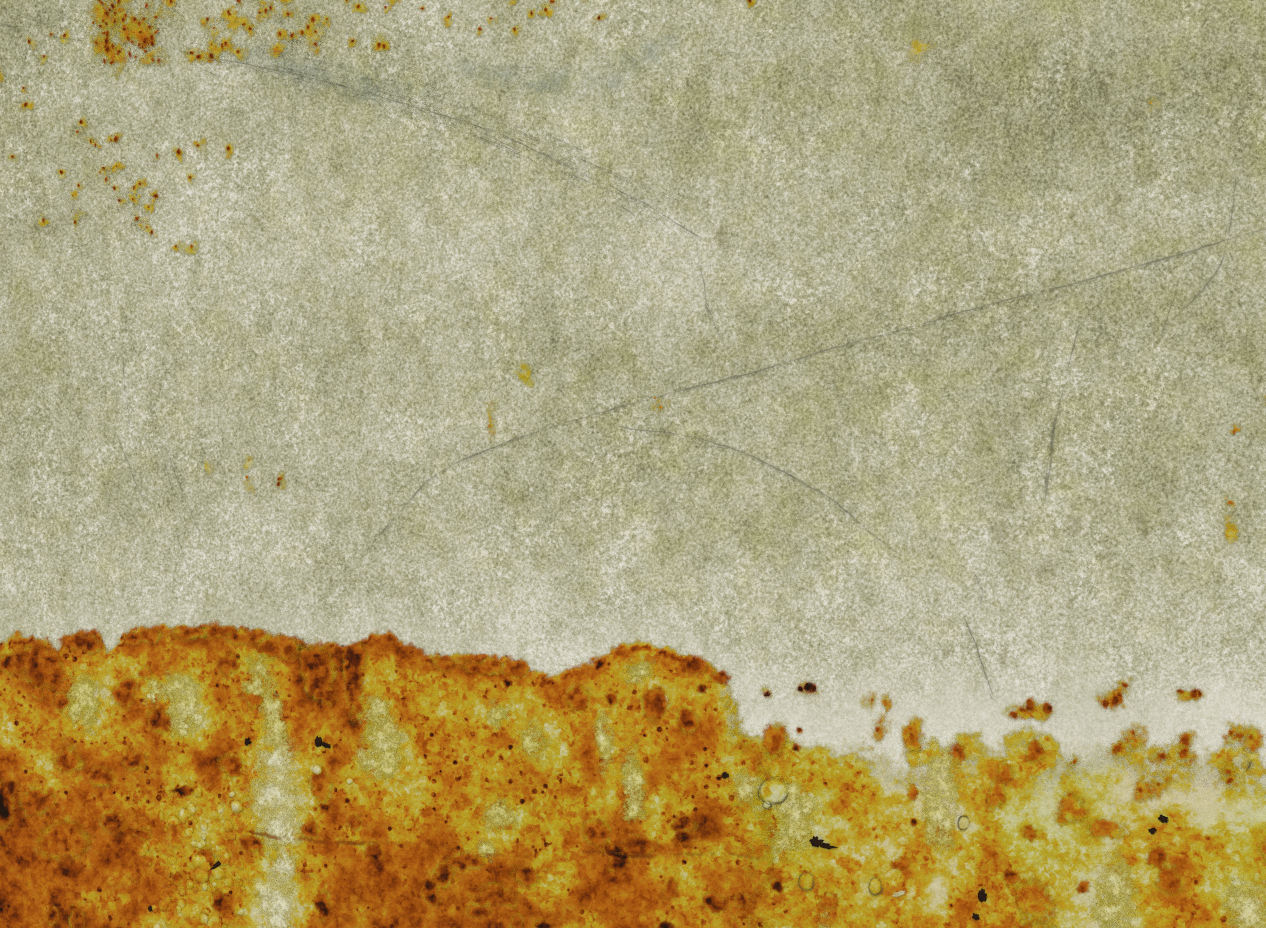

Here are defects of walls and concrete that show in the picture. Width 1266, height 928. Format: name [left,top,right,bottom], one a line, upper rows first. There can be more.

rust [90,0,176,77]
rust [183,0,331,63]
rust [345,0,367,13]
rust [348,32,390,51]
rust [476,0,559,36]
rust [18,86,34,110]
rust [76,116,123,148]
rust [173,138,206,184]
rust [57,169,84,227]
rust [96,161,158,237]
rust [172,241,198,255]
rust [0,622,1266,928]